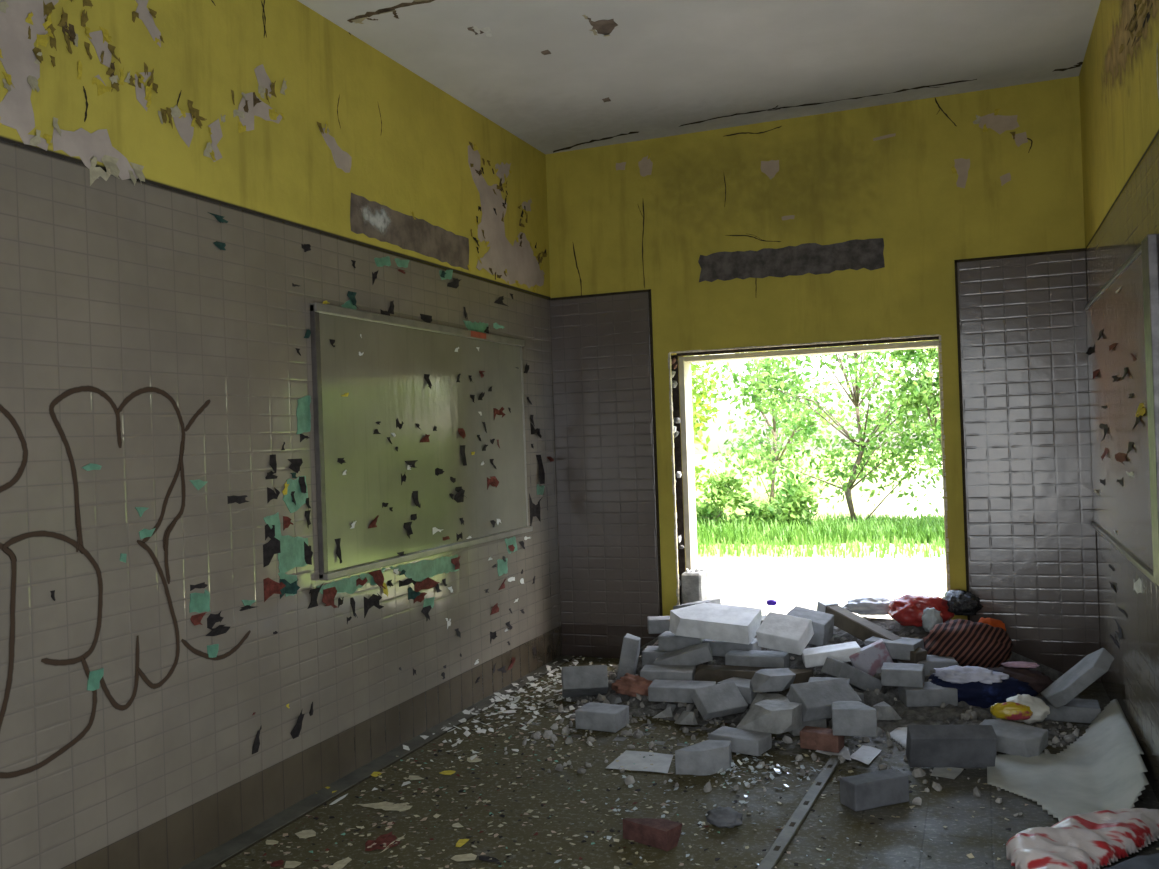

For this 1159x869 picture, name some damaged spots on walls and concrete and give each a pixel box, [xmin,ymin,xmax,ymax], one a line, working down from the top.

crack [347,0,435,35]
peeling [582,15,618,37]
peeling [0,0,287,186]
peeling [317,121,352,173]
crack [679,79,977,137]
flaking render [350,142,547,306]
peeling [698,238,885,282]
peeling [240,442,472,623]
peeling [374,418,437,538]
peeling [457,371,511,490]
peeling [474,397,554,684]
peeling [189,582,230,658]